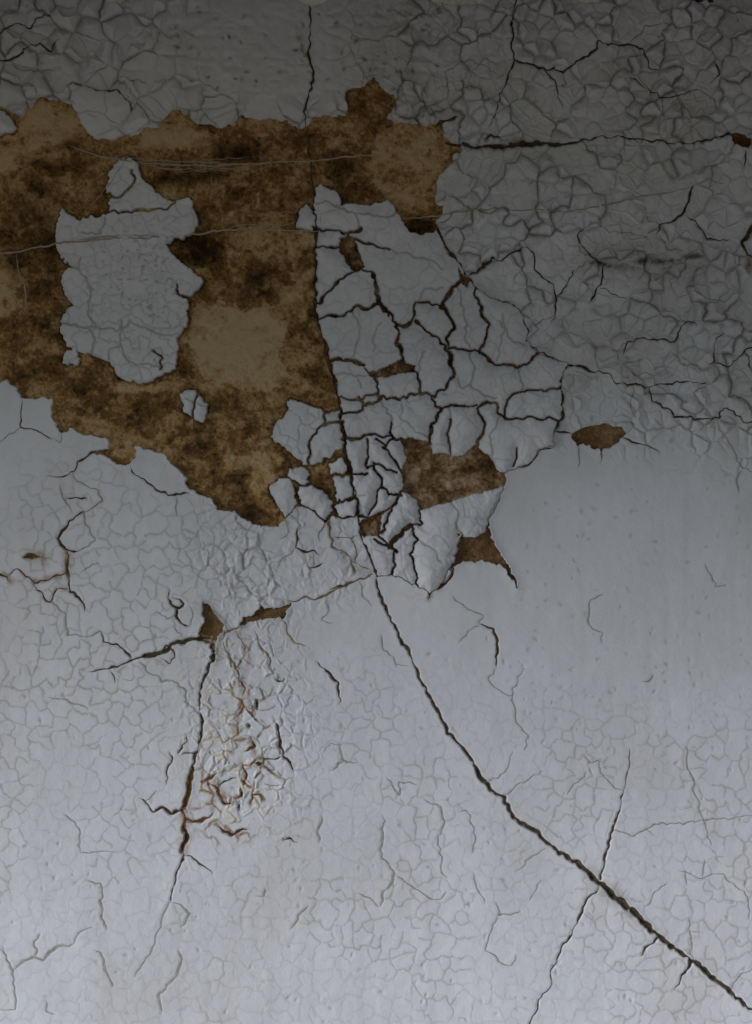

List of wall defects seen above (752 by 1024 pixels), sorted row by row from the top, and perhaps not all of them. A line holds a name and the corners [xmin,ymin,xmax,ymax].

peeling [0,77,568,593]
peeling [571,423,626,452]
crack [278,0,752,1024]
peeling [199,602,224,662]
peeling [240,603,291,625]
crack [0,451,239,1011]
crack [262,724,294,772]